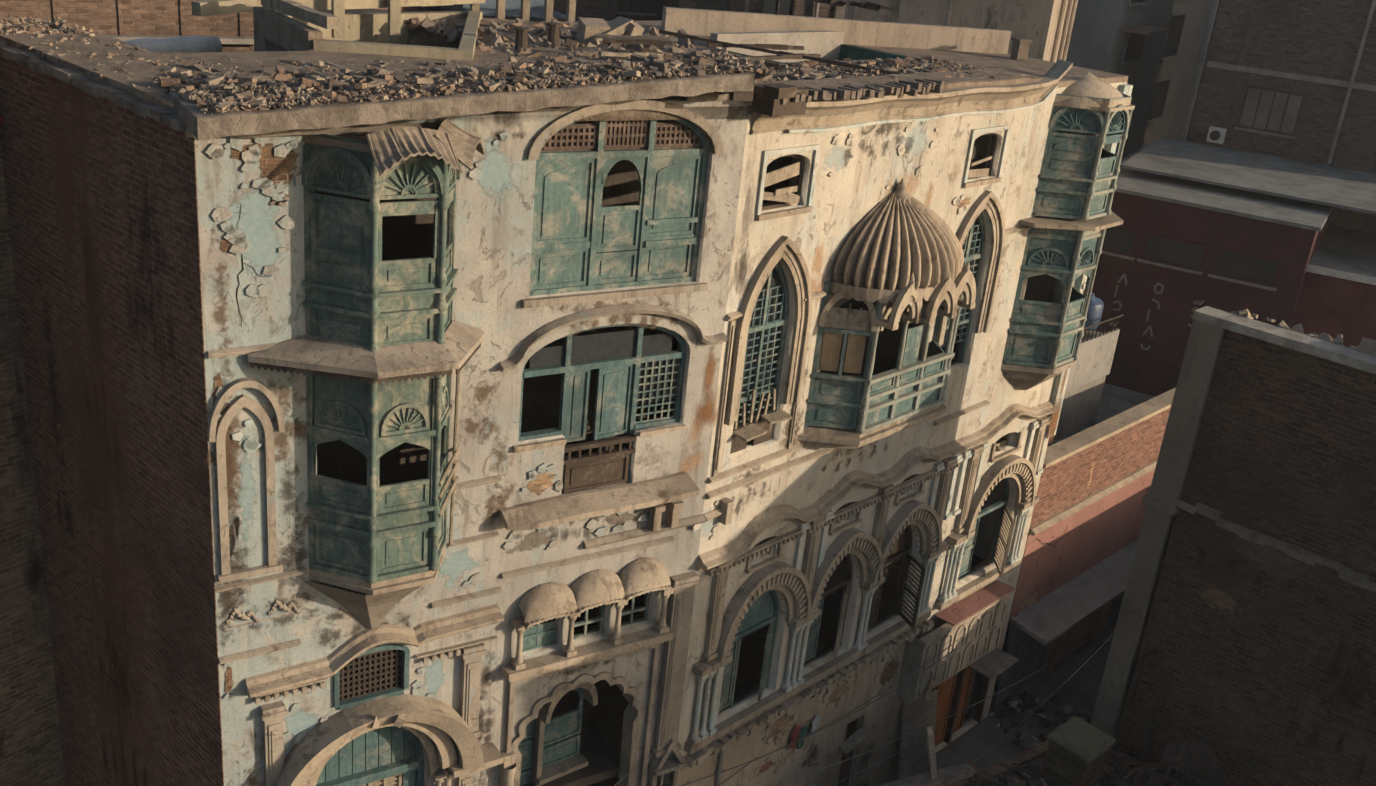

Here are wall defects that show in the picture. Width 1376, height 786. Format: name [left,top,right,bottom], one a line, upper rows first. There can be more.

peeling [826,133,854,177]
water stain [214,266,231,376]
crack [236,207,267,327]
peeling [205,136,304,298]
corrosion [697,356,716,423]
water stain [208,392,240,509]
water stain [218,532,257,645]
water stain [259,376,361,648]
flaking render [503,526,558,553]
flaking render [521,463,563,496]